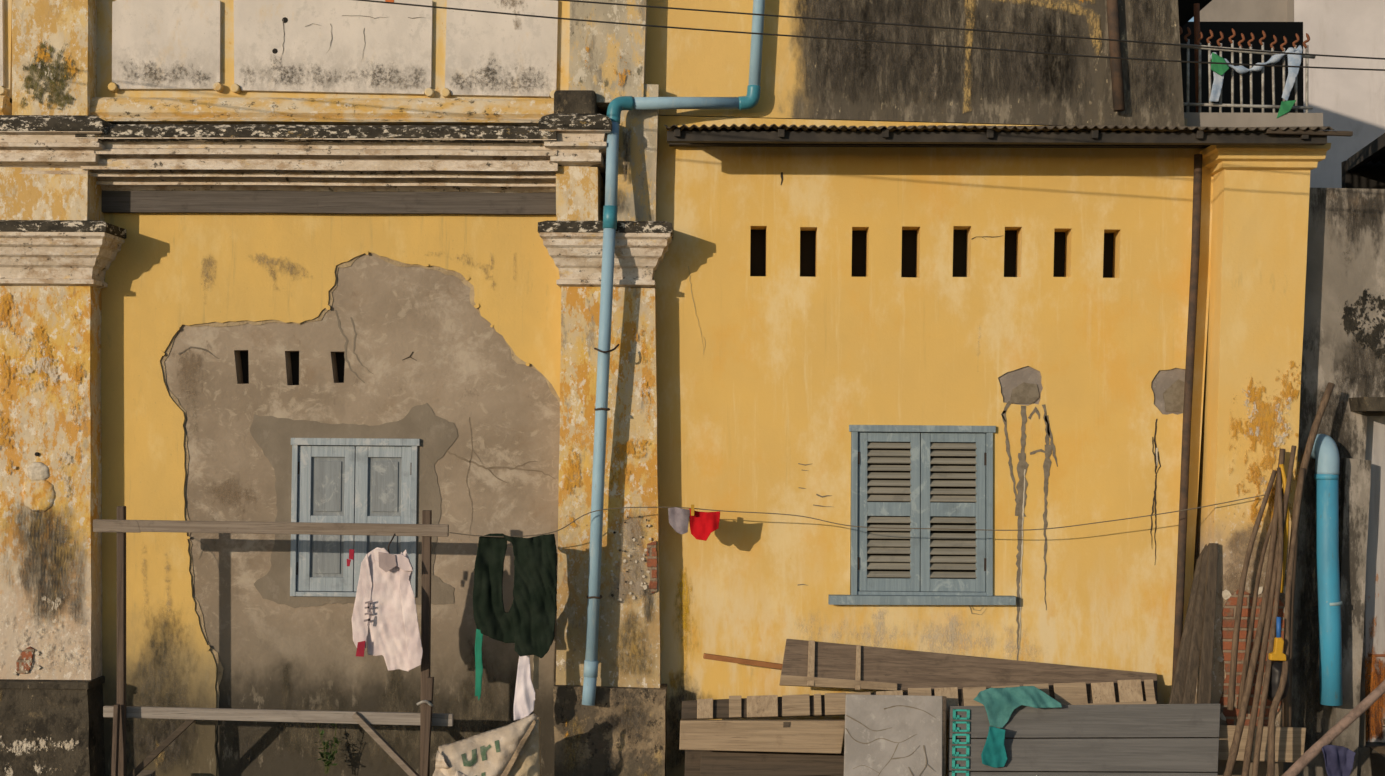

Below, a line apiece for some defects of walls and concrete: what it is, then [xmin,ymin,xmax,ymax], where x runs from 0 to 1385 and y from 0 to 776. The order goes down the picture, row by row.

leakage [455,63,531,89]
leakage [797,0,1101,113]
leakage [1129,0,1171,112]
peeling [0,292,85,497]
leakage [1316,289,1385,529]
spalling [13,647,41,676]
spalling [160,251,583,776]
spalling [611,512,657,602]
spalling [1218,361,1301,726]
leakage [1299,459,1323,750]
rust [1365,618,1385,742]
peeling [0,736,79,776]